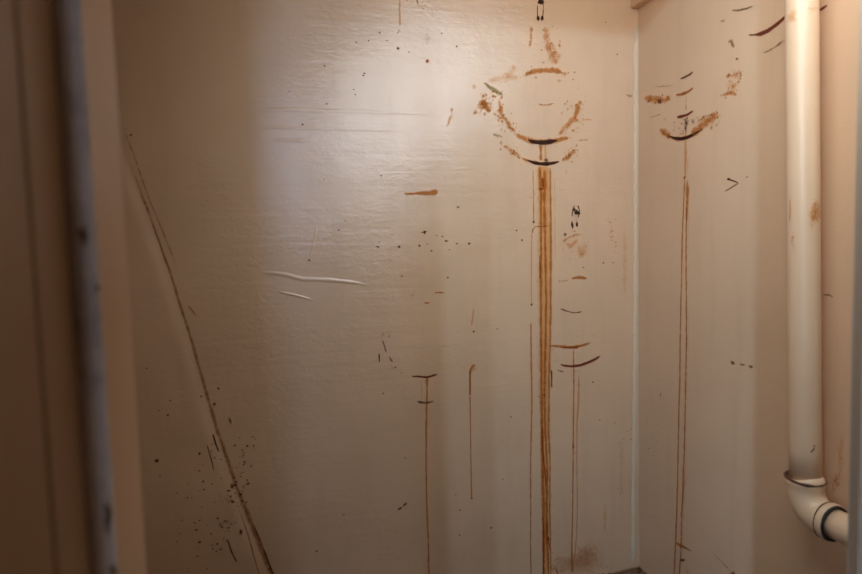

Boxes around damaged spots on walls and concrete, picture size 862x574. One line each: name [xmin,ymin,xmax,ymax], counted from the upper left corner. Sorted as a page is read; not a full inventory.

corrosion [551,356,600,386]